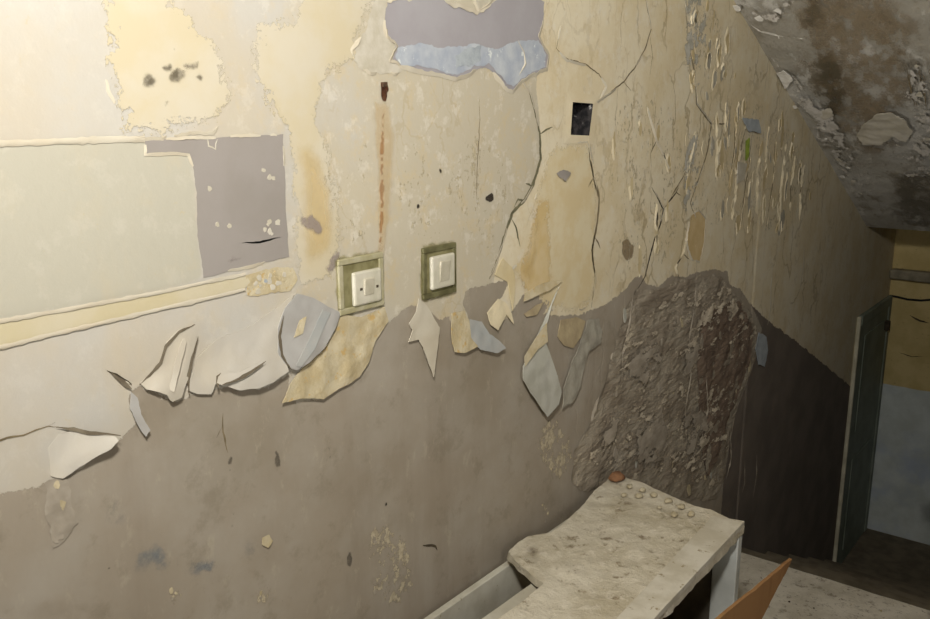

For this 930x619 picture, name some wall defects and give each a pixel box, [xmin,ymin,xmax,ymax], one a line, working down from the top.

water stain [163,65,202,81]
peeling [102,0,550,436]
rust [381,82,389,101]
crack [489,81,552,279]
peeling [451,92,603,417]
crack [588,138,601,307]
crack [636,0,724,292]
spalling [570,0,811,502]
water stain [799,0,906,150]
peeling [856,61,930,177]
crack [0,422,59,441]
peeling [48,427,121,478]